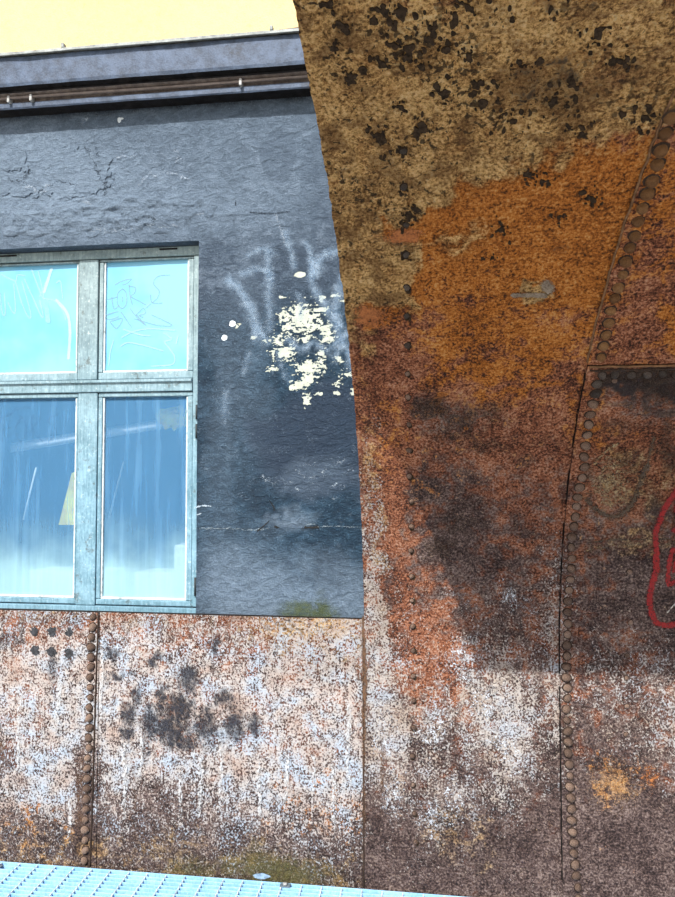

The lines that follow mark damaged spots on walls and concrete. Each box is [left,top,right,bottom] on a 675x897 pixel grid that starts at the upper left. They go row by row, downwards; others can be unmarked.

crack [7,146,204,233]
corrosion [377,227,426,245]
peeling [251,293,354,409]
corrosion [349,304,390,329]
water stain [120,666,202,776]
corrosion [585,765,664,810]